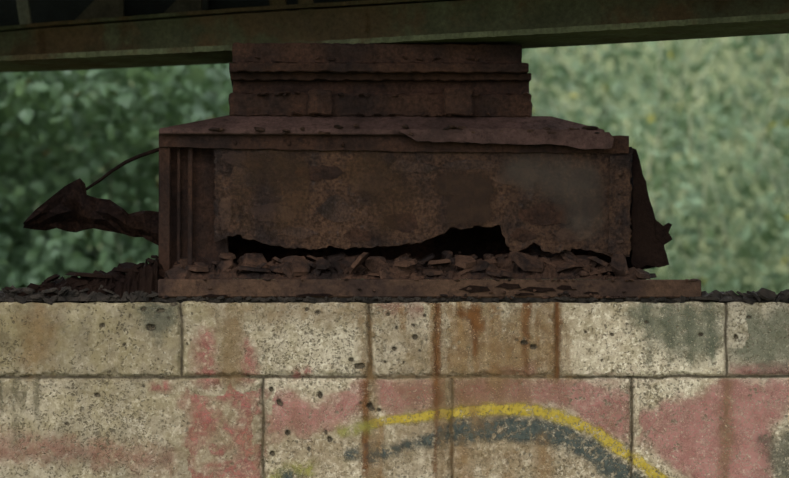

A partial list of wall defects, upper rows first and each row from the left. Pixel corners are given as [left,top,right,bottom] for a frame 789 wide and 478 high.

corrosion [432,303,441,425]
corrosion [458,304,484,356]